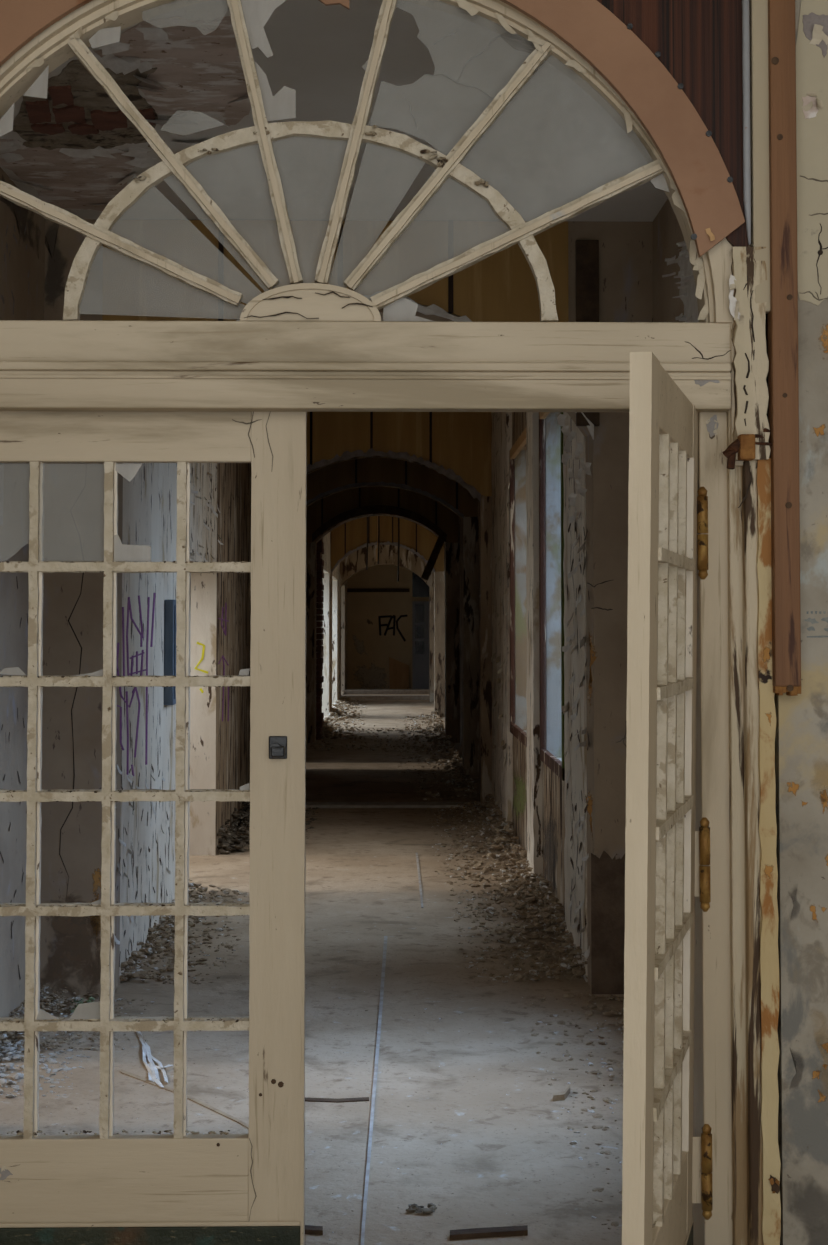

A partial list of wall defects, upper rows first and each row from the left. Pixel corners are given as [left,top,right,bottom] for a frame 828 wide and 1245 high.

peeling [456,0,479,16]
peeling [495,13,555,54]
peeling [565,60,587,73]
peeling [0,11,251,216]
peeling [621,107,633,133]
crack [801,213,828,301]
peeling [404,297,472,322]
peeling [728,275,744,324]
crack [59,463,87,898]
flaking render [562,504,625,994]